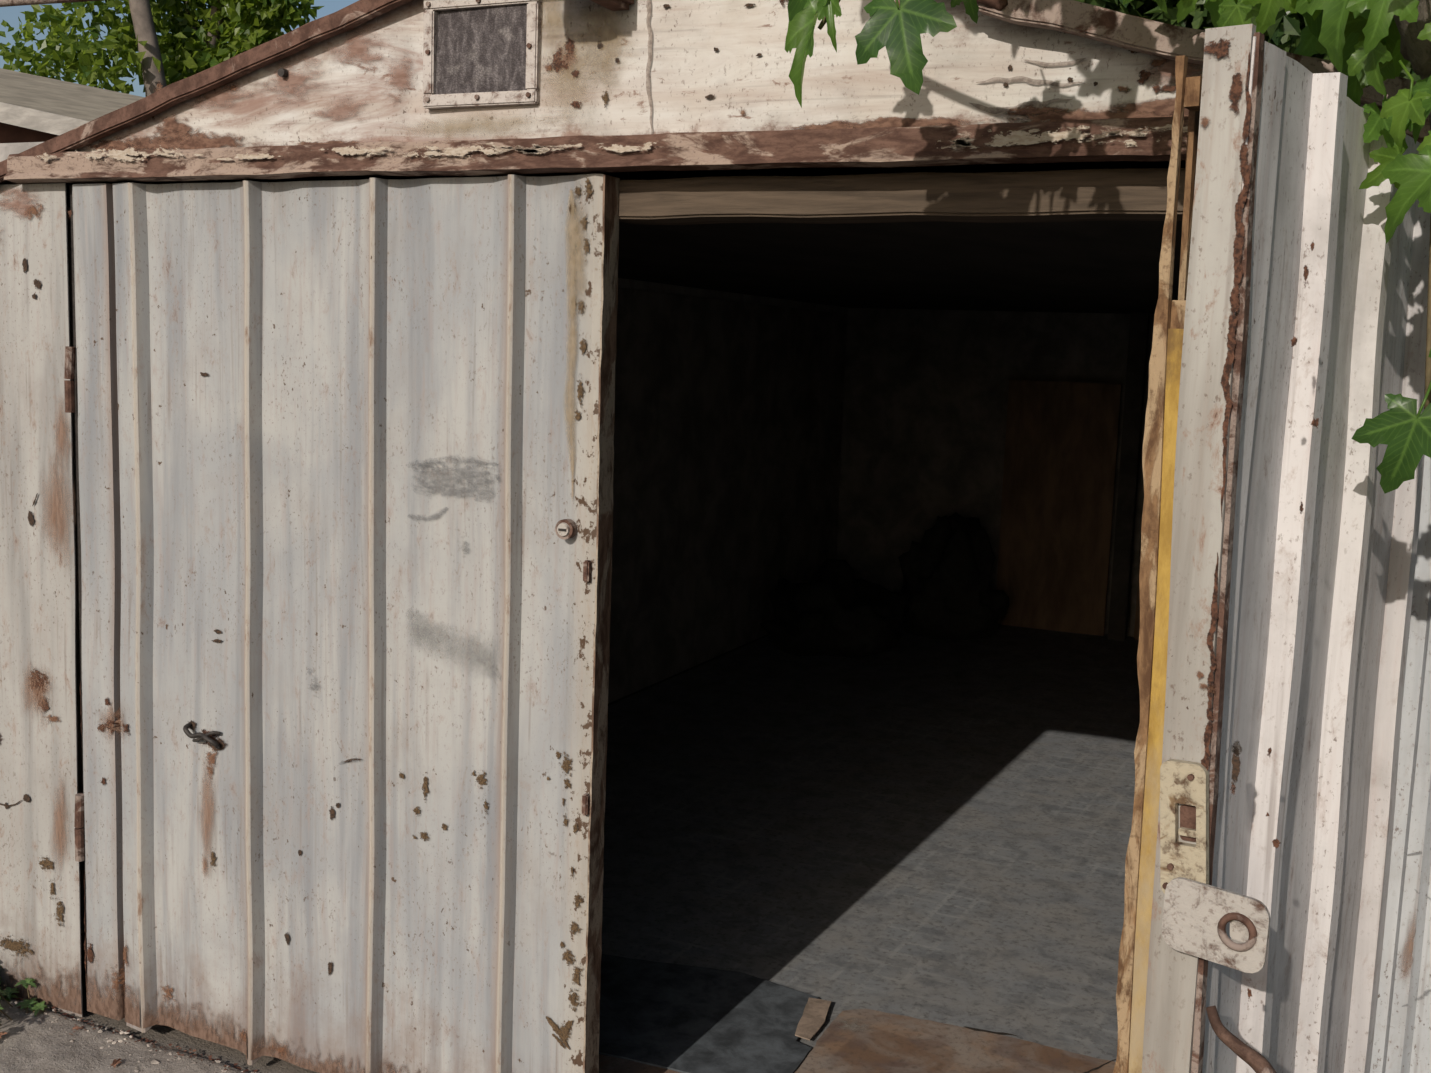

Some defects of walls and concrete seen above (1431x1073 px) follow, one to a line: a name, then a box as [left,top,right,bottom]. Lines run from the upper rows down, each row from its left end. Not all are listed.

peeling [37,145,301,163]
peeling [319,142,582,158]
peeling [600,142,657,153]
peeling [939,124,1188,150]
corrosion [0,189,43,220]
corrosion [1197,32,1265,886]
corrosion [25,669,60,722]
corrosion [188,720,227,872]
corrosion [0,883,401,1073]
corrosion [1191,958,1208,1073]